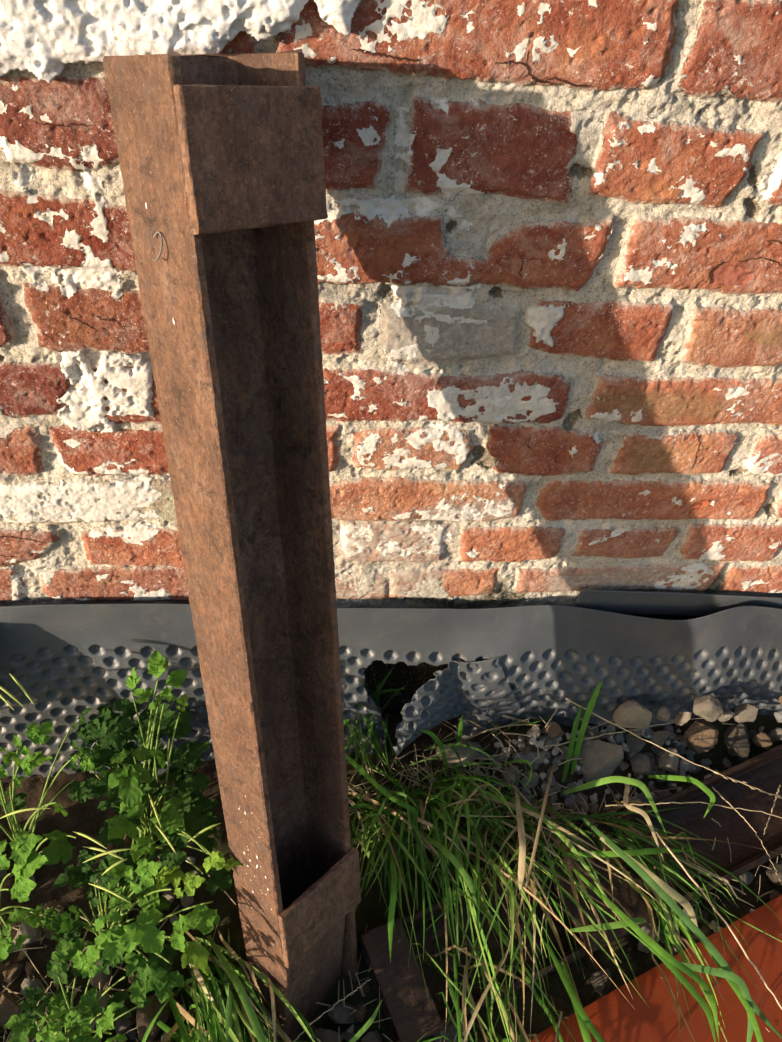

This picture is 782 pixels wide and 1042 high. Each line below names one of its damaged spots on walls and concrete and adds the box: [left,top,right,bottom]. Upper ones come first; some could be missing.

flaking render [0,0,484,91]
crack [497,50,588,87]
crack [663,22,677,73]
peeling [0,100,52,123]
peeling [431,96,452,115]
crack [709,240,782,286]
flaking render [0,350,165,545]
peeling [353,376,559,470]